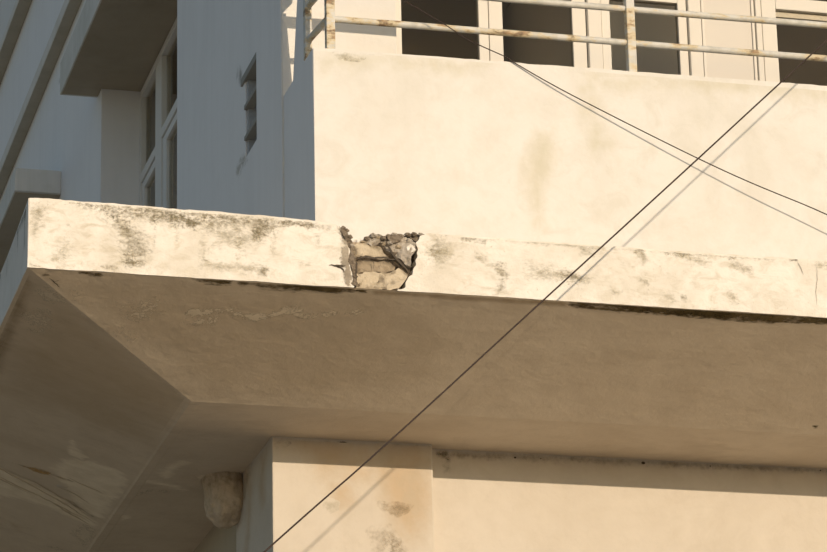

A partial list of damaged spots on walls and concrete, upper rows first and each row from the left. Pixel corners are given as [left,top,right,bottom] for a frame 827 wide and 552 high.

spalling [339,226,425,291]
damp [0,269,493,452]
peeling [0,439,133,528]